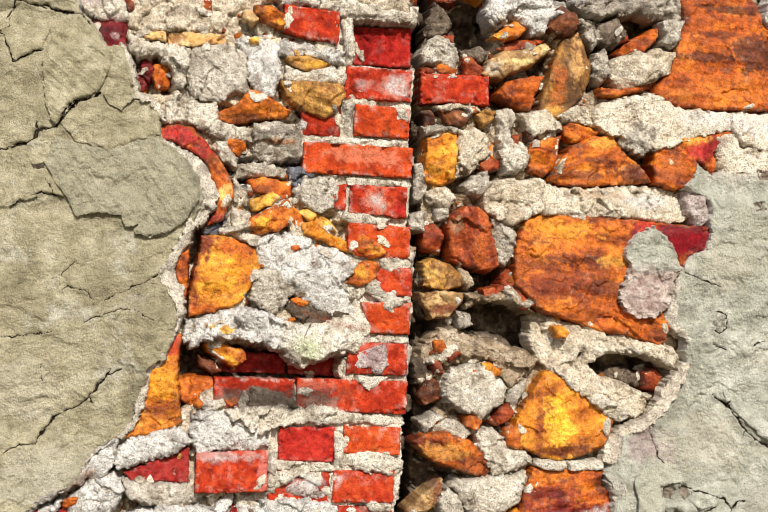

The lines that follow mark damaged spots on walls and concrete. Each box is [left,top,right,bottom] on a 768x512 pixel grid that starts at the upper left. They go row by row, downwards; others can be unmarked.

crack [0,0,90,62]
crack [0,92,101,150]
crack [13,178,64,206]
flaking render [0,11,220,346]
crack [61,260,158,325]
flaking render [617,225,692,344]
crack [3,368,122,454]
spalling [26,353,164,512]
spalling [597,361,727,512]
crack [712,393,768,448]
flaking render [723,390,768,440]
crack [681,484,745,512]